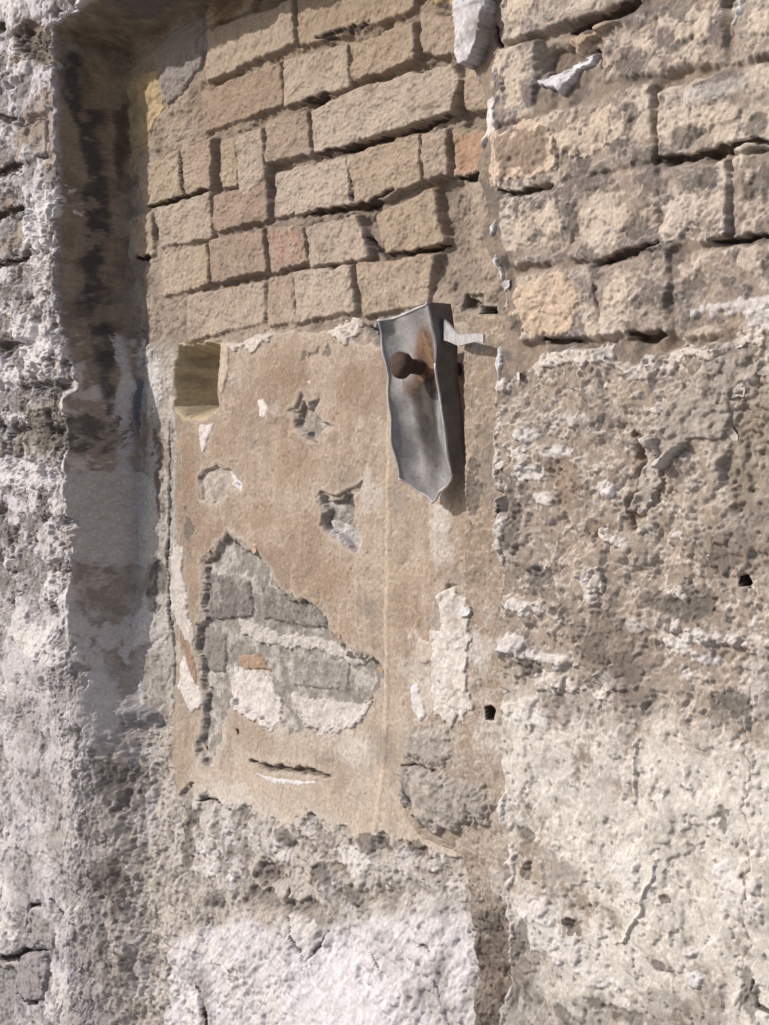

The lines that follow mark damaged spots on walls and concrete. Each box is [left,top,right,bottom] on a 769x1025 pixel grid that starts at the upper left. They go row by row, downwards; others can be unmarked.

peeling [218,328,275,394]
peeling [199,423,214,454]
spalling [285,380,339,443]
rust [409,328,438,463]
peeling [0,402,159,569]
spalling [196,463,243,507]
spalling [314,480,363,556]
peeling [169,526,386,776]
crack [251,759,331,786]
crack [735,589,769,1020]
crack [0,898,70,962]
crack [22,997,39,1005]